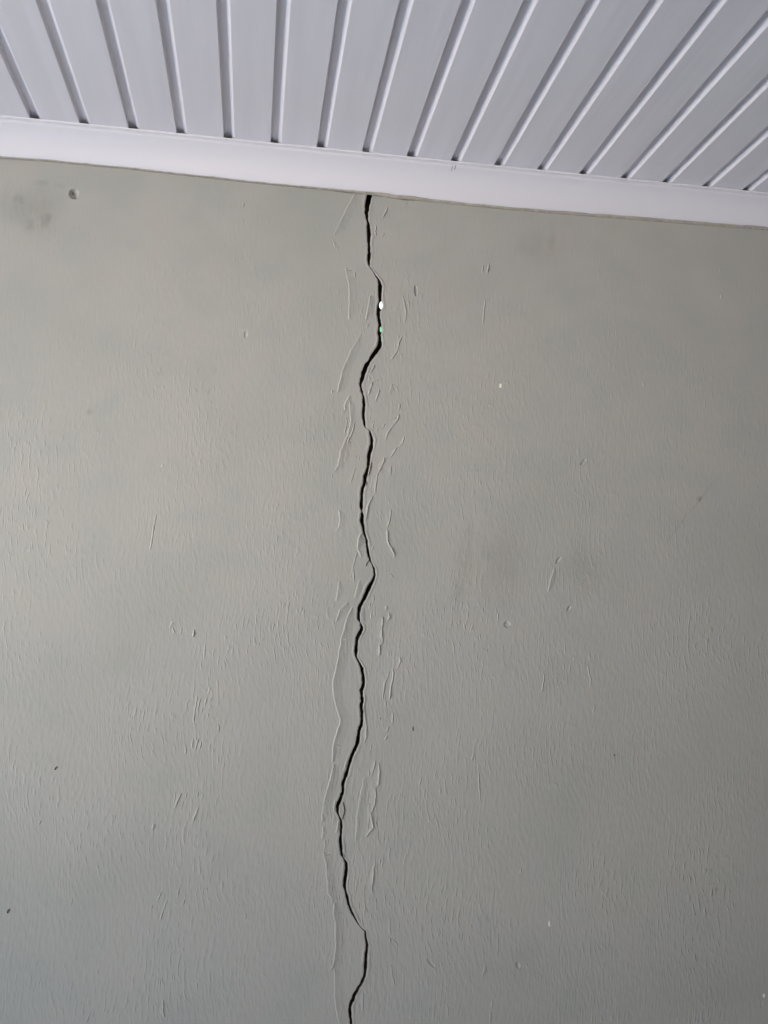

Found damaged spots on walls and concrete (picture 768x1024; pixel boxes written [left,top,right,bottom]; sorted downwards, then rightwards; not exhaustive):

crack [332,194,386,1024]